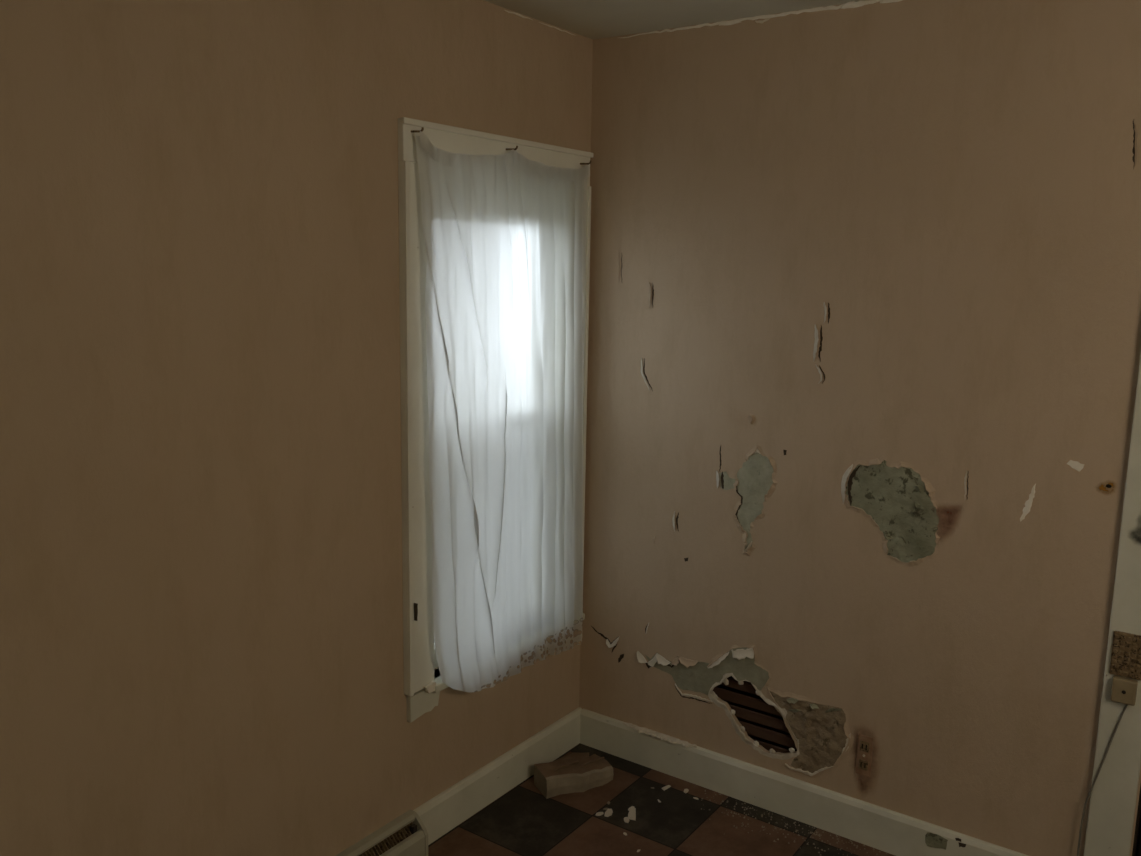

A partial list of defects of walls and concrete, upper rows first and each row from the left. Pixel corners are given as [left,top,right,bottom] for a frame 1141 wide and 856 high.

peeling [716,444,787,557]
peeling [841,456,942,567]
flaking render [637,645,855,778]